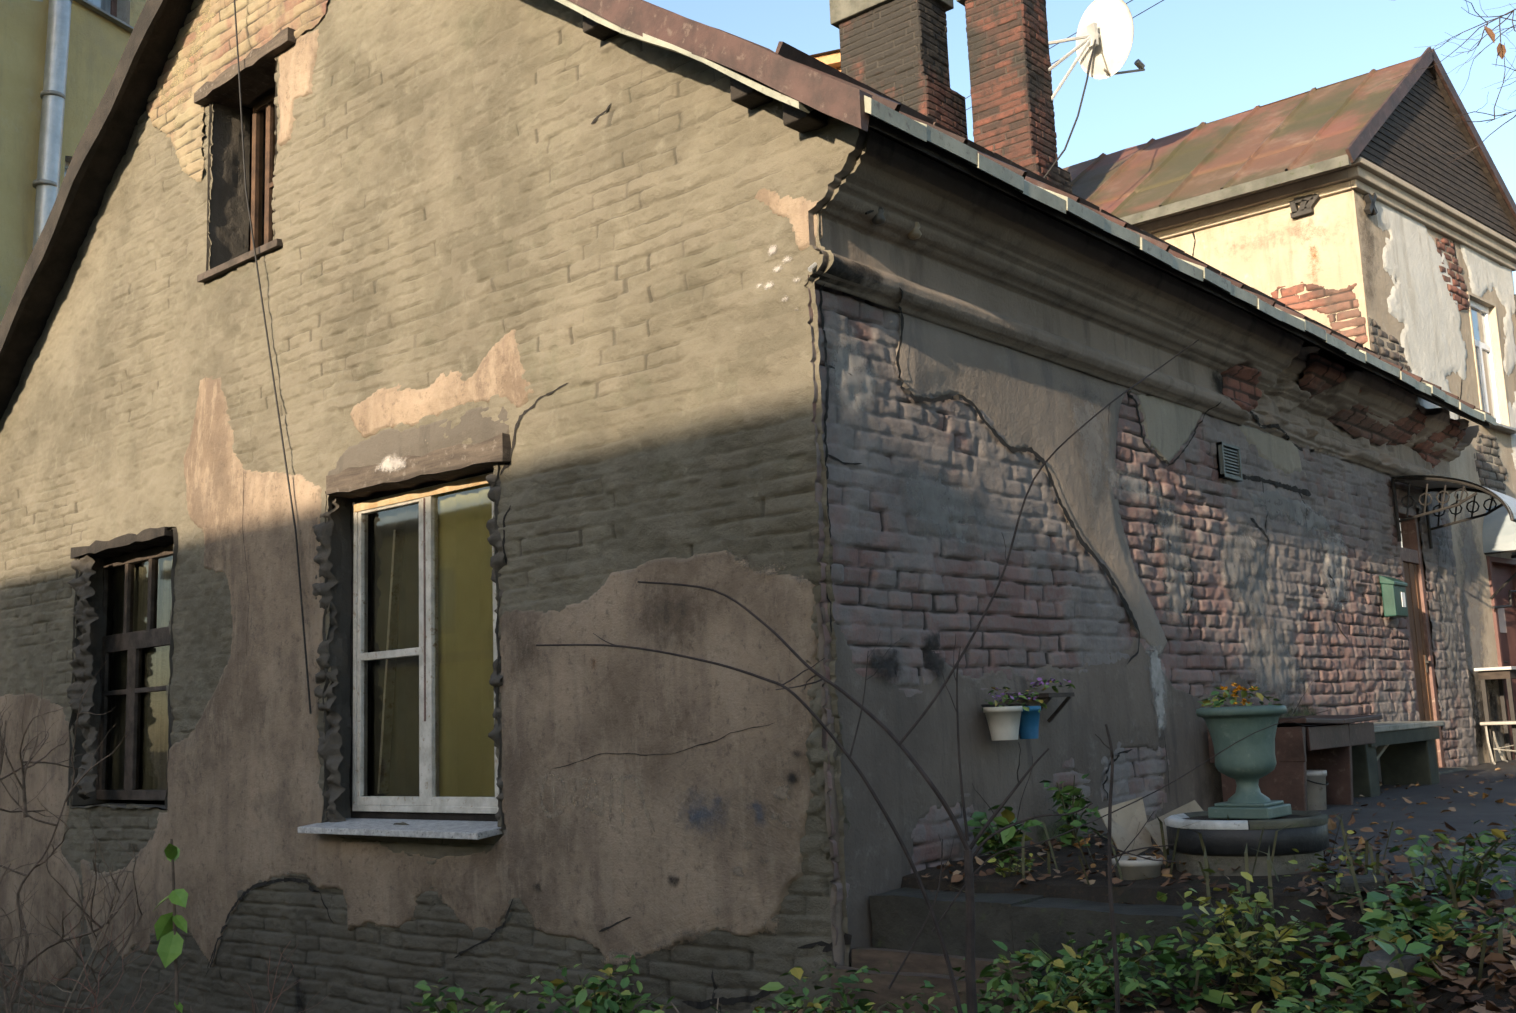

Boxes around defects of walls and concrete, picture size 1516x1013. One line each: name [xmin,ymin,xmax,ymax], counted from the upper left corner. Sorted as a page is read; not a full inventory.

peeling [147,0,328,182]
spalling [67,555,98,800]
crack [819,285,862,635]
crack [896,287,1140,663]
crack [1186,548,1194,634]
spalling [1221,365,1262,412]
peeling [1271,200,1516,499]